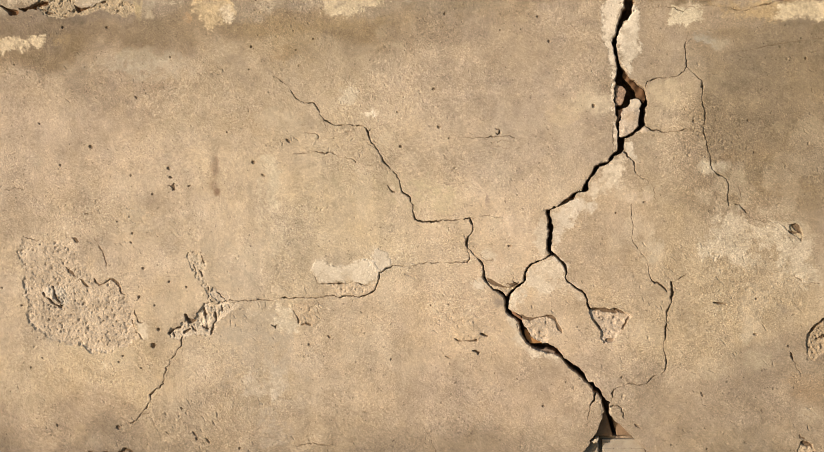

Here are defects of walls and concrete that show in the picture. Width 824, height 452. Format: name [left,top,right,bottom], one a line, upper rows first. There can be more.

spalling [0,0,136,29]
crack [208,0,791,427]
spalling [17,235,241,363]
crack [122,337,183,426]
spalling [806,318,824,362]